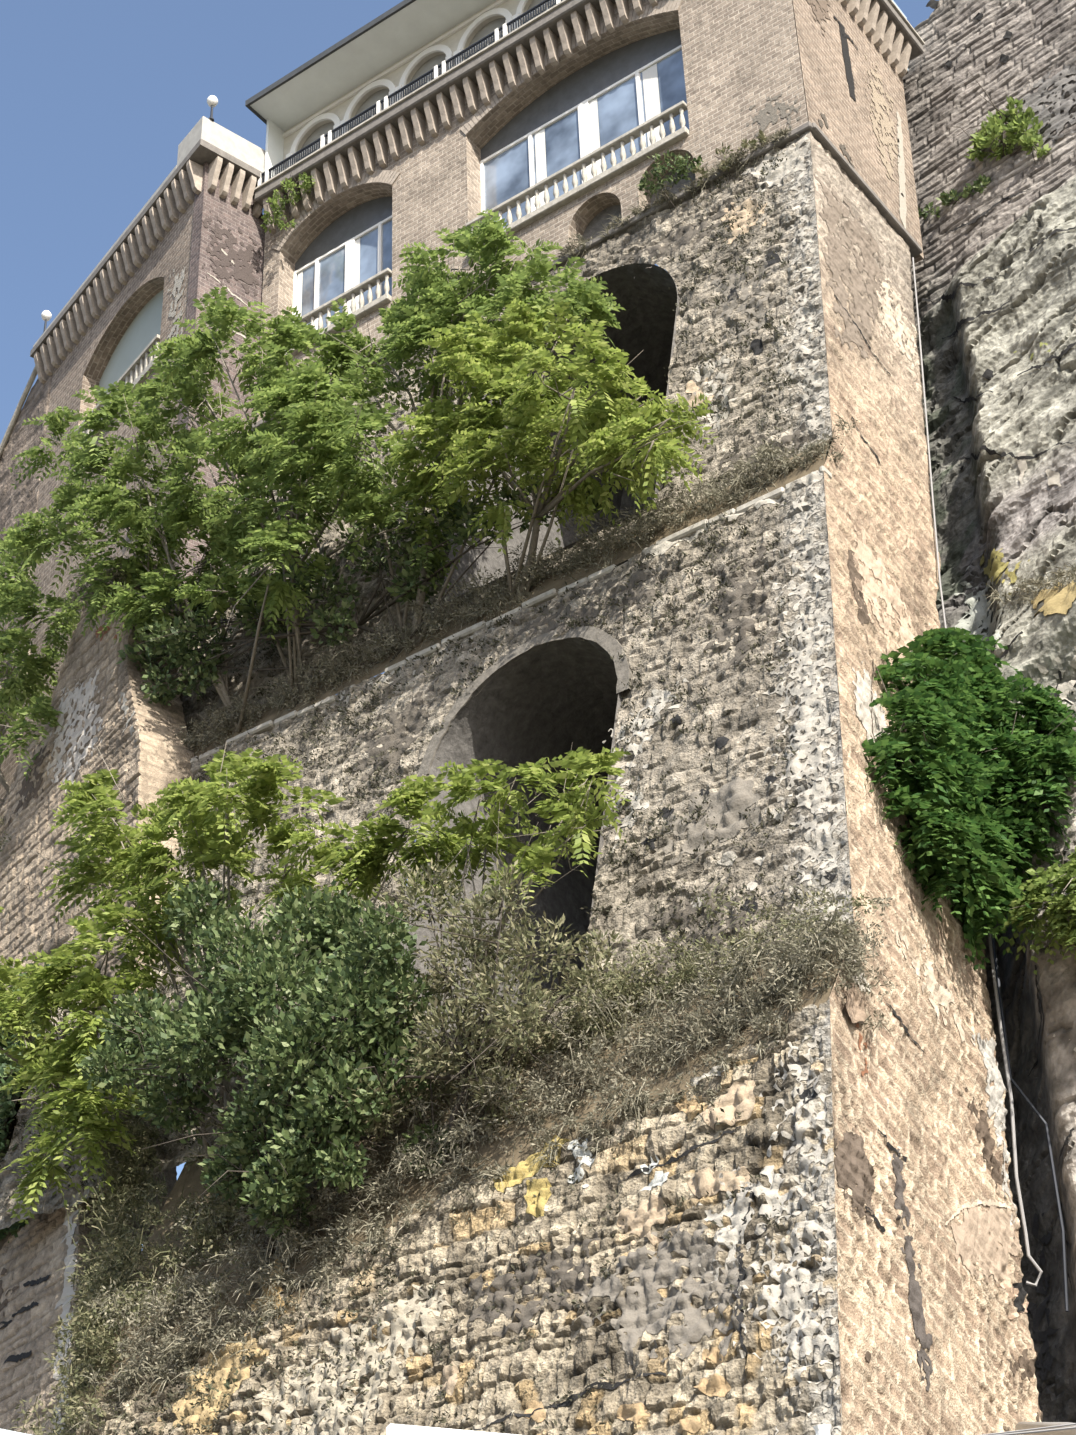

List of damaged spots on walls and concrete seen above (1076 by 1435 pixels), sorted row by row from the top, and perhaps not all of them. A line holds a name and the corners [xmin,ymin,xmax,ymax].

crack [833,14,858,50]
crack [878,1129,916,1174]